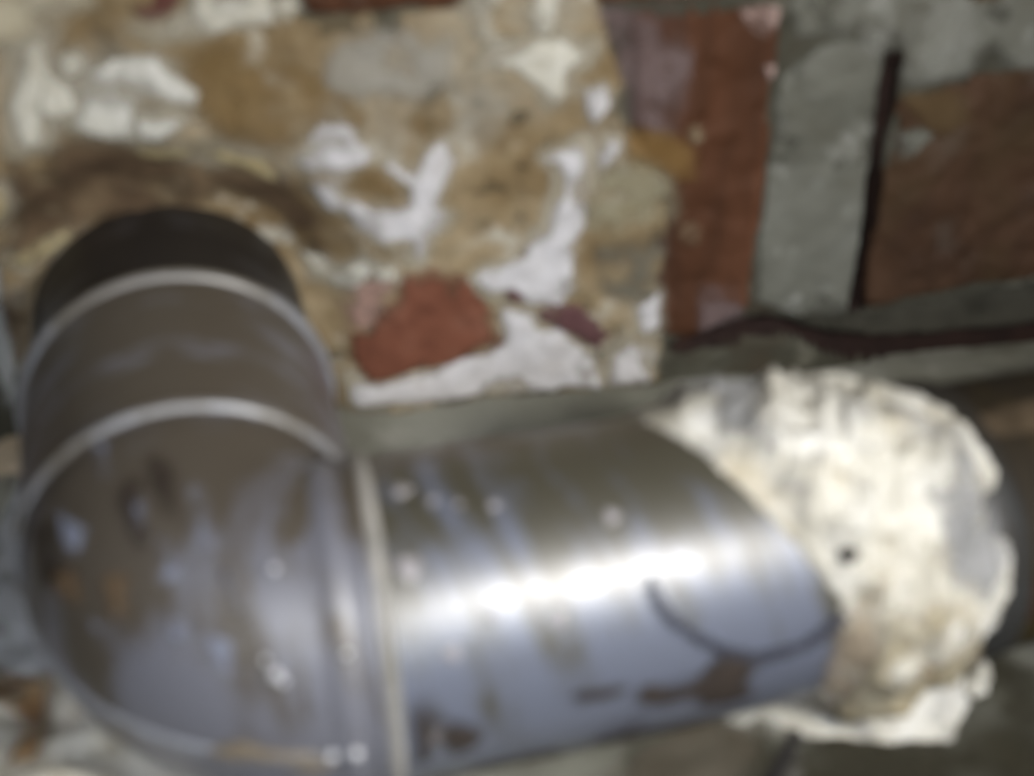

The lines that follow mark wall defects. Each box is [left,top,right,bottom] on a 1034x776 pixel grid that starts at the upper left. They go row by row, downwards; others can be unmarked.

flaking render [476,0,602,105]
flaking render [0,0,299,180]
flaking render [585,87,609,122]
flaking render [297,125,371,170]
flaking render [901,129,933,154]
flaking render [0,182,19,225]
flaking render [4,227,86,274]
flaking render [301,132,661,409]
flaking render [0,305,16,404]